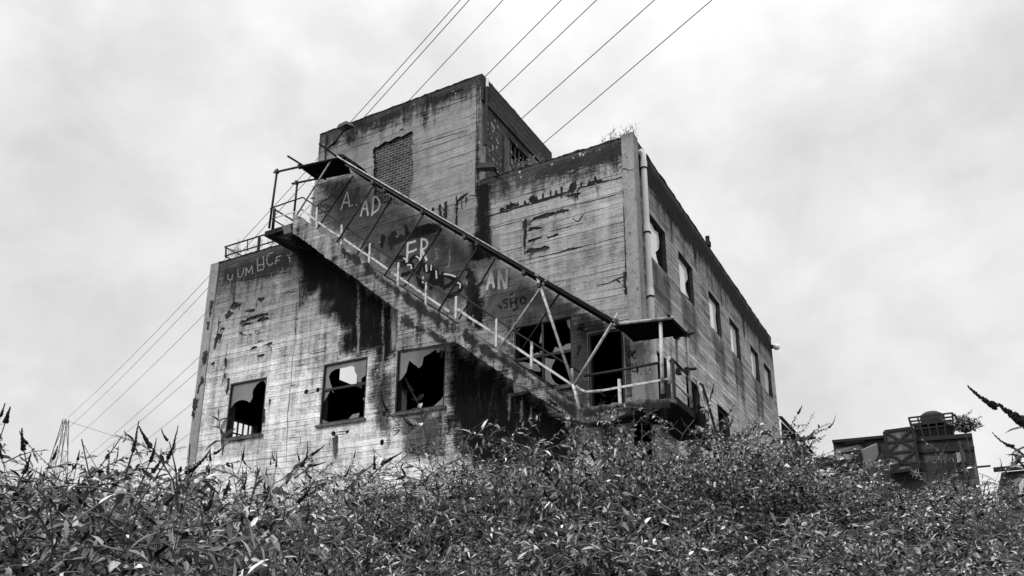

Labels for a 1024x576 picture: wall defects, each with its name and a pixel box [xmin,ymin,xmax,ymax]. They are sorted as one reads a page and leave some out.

spalling [191,296,273,420]